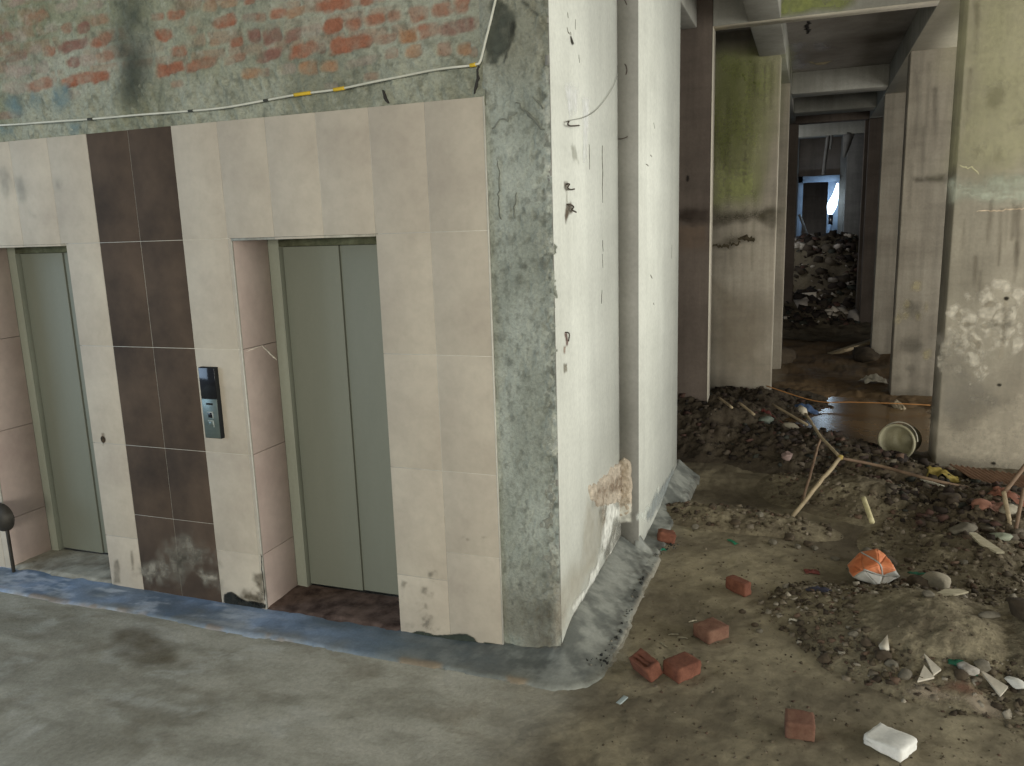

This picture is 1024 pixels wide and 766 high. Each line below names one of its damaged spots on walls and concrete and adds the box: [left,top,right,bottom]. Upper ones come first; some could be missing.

leakage [679,211,695,222]
crack [712,234,755,249]
leakage [924,280,1024,385]
flaking render [588,458,633,519]